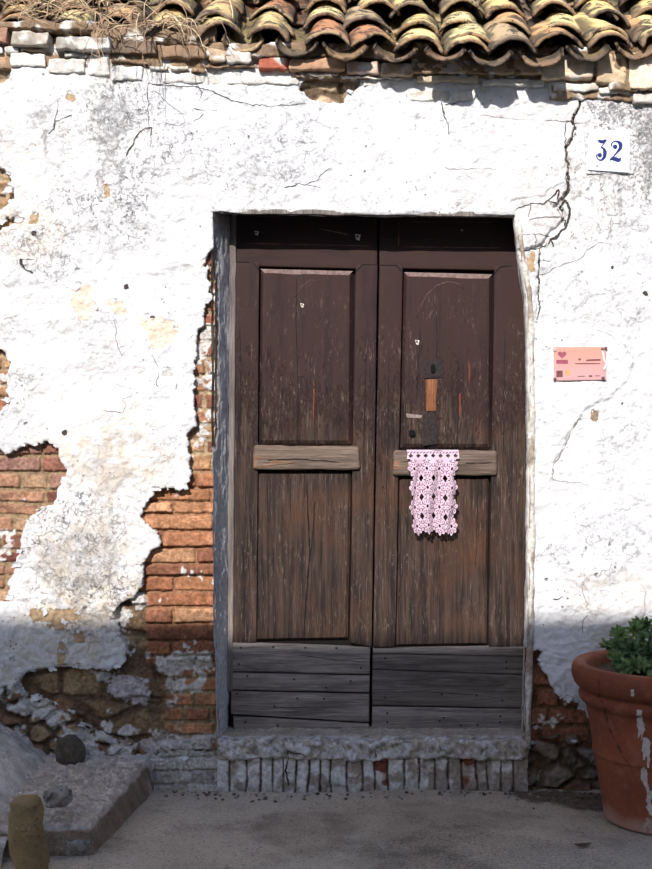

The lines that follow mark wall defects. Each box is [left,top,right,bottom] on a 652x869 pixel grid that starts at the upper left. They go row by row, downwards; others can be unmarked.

flaking render [0,70,11,84]
crack [126,83,307,156]
spalling [299,80,360,104]
flaking render [0,169,39,236]
crack [486,101,615,323]
crack [552,399,608,484]
flaking render [0,251,220,761]
spalling [522,644,600,791]